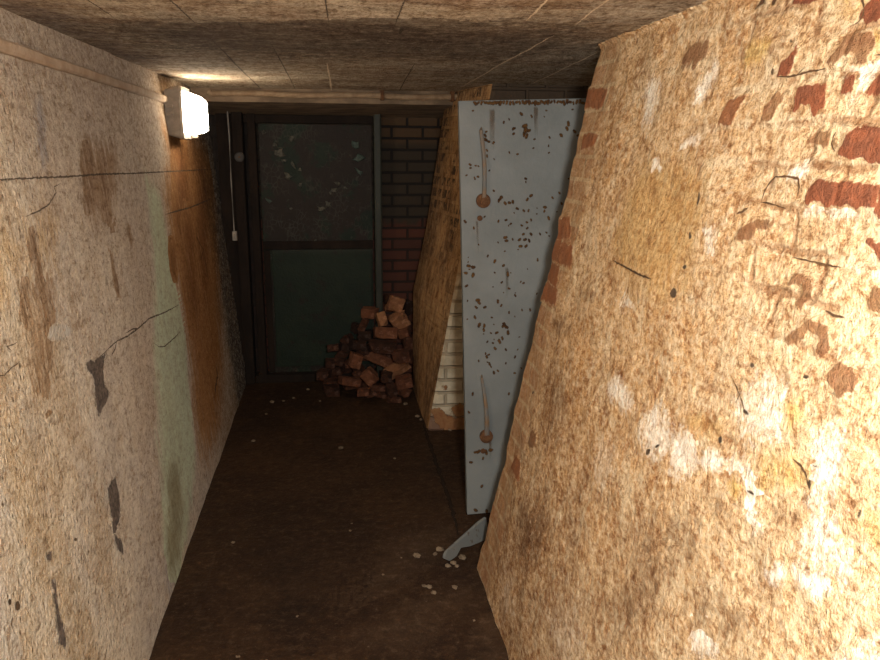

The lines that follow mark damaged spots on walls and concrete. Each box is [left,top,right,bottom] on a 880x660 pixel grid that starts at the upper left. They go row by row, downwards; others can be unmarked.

flaking render [717,91,748,129]
flaking render [760,0,880,222]
flaking render [540,214,575,308]
flaking render [733,215,780,244]
flaking render [863,233,880,268]
flaking render [866,280,880,317]
spalling [86,354,109,416]
crack [100,305,178,357]
leakage [494,52,880,660]
flaking render [784,267,863,404]
peeling [430,403,464,430]
spalling [108,478,123,554]